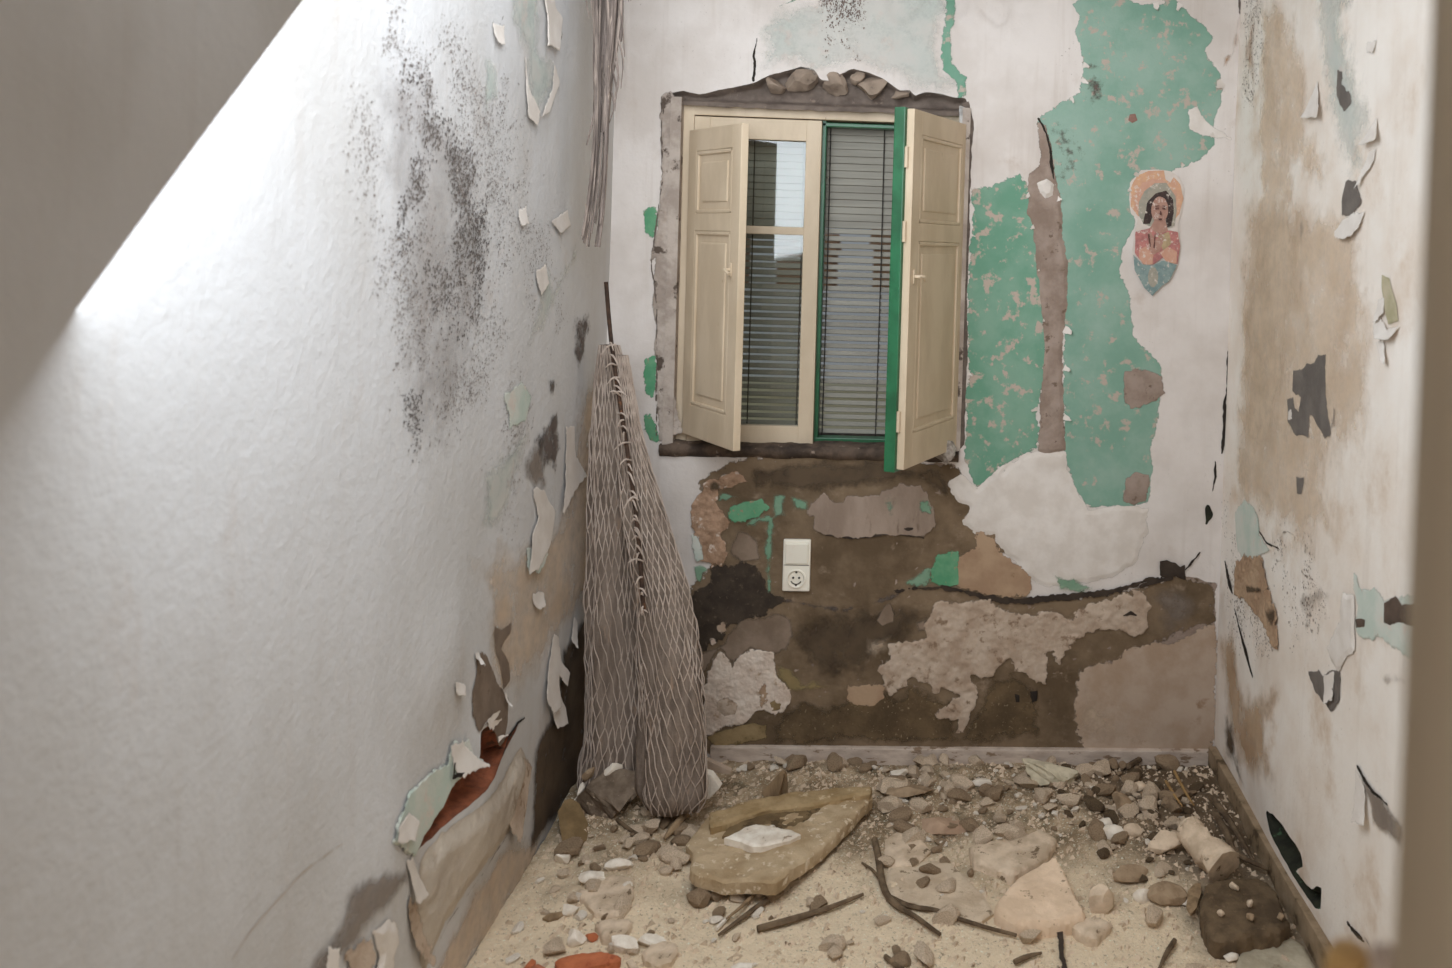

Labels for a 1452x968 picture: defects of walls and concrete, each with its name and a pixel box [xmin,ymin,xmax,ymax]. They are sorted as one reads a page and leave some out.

water stain [819,0,867,61]
spalling [315,622,525,968]
water stain [343,0,589,535]
peeling [643,0,1290,754]
water stain [690,457,1269,770]
crack [894,351,1253,677]
water stain [1224,0,1362,634]
spalling [1266,811,1321,909]
spalling [1287,354,1335,438]
peeling [1308,573,1408,712]
spalling [1351,765,1399,841]
peeling [1373,275,1398,365]